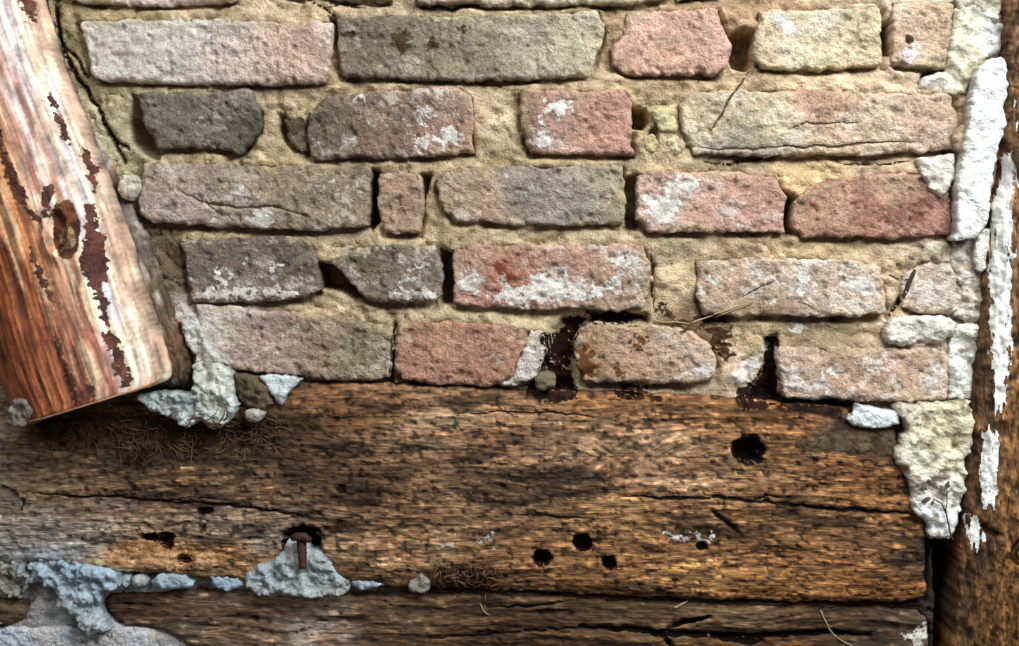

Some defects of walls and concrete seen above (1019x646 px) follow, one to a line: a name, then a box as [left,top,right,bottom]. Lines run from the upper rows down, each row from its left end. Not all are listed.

crack [55,0,128,163]
water stain [535,92,574,148]
crack [692,73,922,167]
water stain [636,169,700,224]
flaking render [846,4,1019,553]
water stain [453,249,647,404]
rust [574,343,601,378]
rust [613,361,662,402]
rust [628,333,650,352]
crack [620,494,914,532]
crack [431,600,869,645]